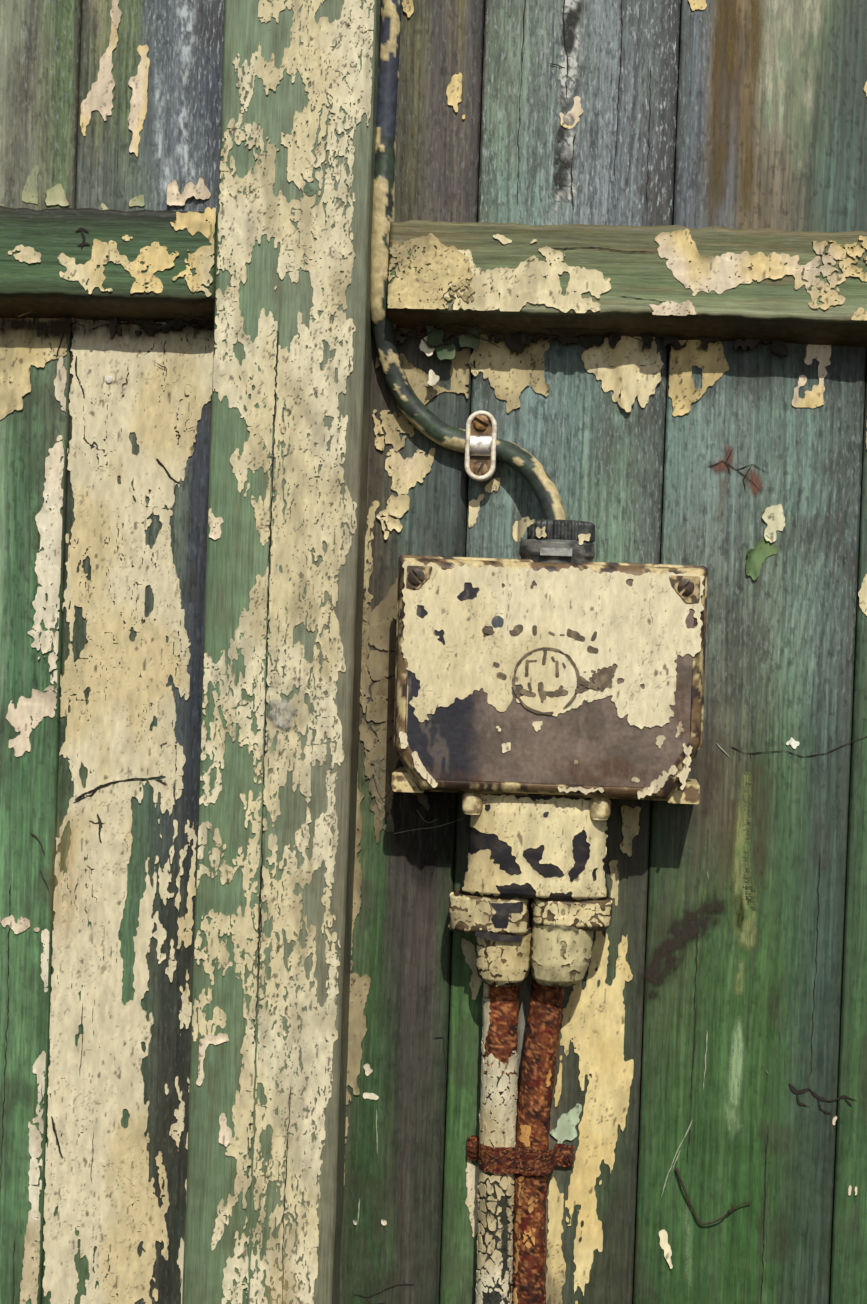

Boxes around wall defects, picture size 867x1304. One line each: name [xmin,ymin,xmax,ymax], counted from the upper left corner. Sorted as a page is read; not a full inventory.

peeling [649,228,867,321]
peeling [581,336,729,417]
peeling [792,344,831,409]
peeling [858,574,867,616]
peeling [0,0,435,1304]
crack [74,777,165,842]
peeling [461,931,634,1304]